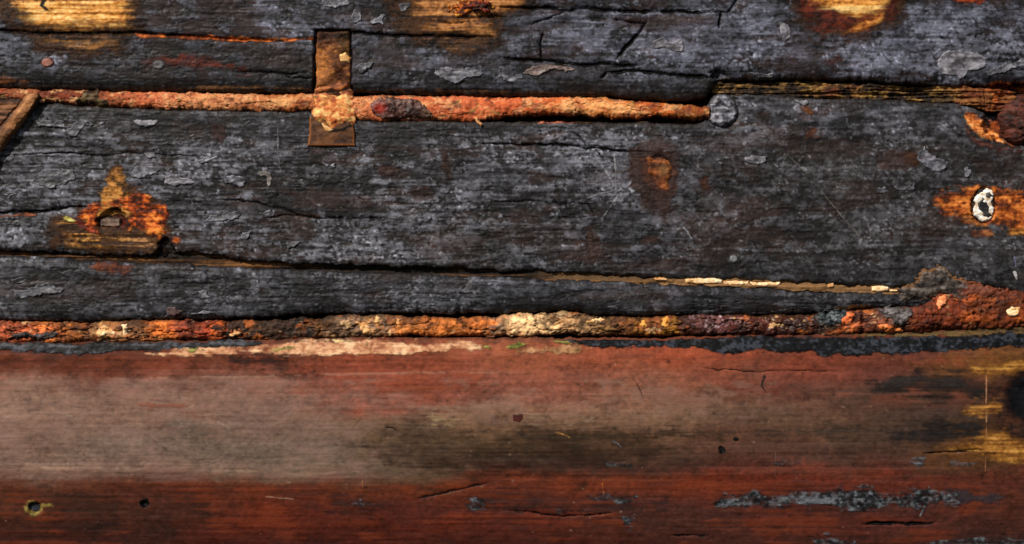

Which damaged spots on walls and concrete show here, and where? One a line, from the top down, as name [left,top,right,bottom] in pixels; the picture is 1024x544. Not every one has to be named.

corrosion [0,88,317,113]
corrosion [351,94,710,123]
corrosion [965,82,1024,152]
corrosion [640,148,676,191]
corrosion [44,166,180,274]
corrosion [935,185,1024,236]
corrosion [0,264,1024,343]